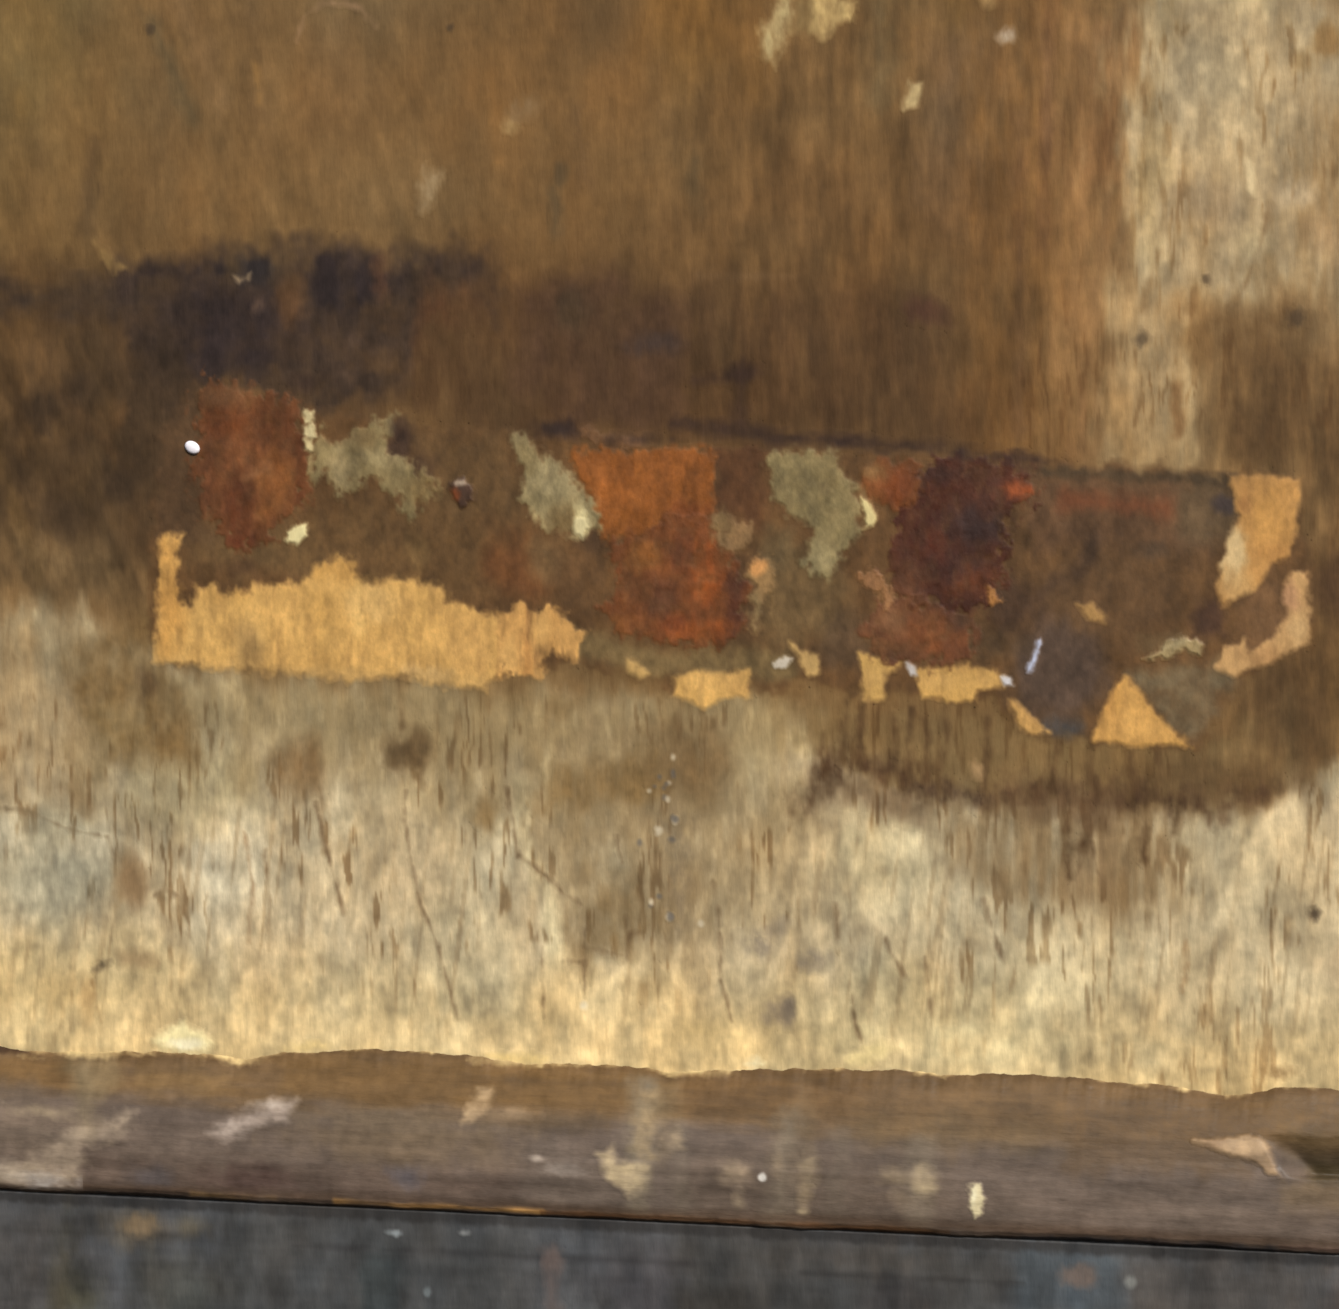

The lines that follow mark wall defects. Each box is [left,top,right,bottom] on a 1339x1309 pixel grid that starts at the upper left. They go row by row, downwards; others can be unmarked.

damp [0,218,701,574]
damp [777,277,1339,885]
damp [55,597,210,779]
damp [262,724,334,859]
damp [373,680,444,793]
damp [469,784,504,841]
damp [525,710,748,824]
damp [114,841,154,918]
damp [112,943,163,975]
damp [553,880,680,1007]
damp [757,990,801,1034]
damp [730,911,839,978]